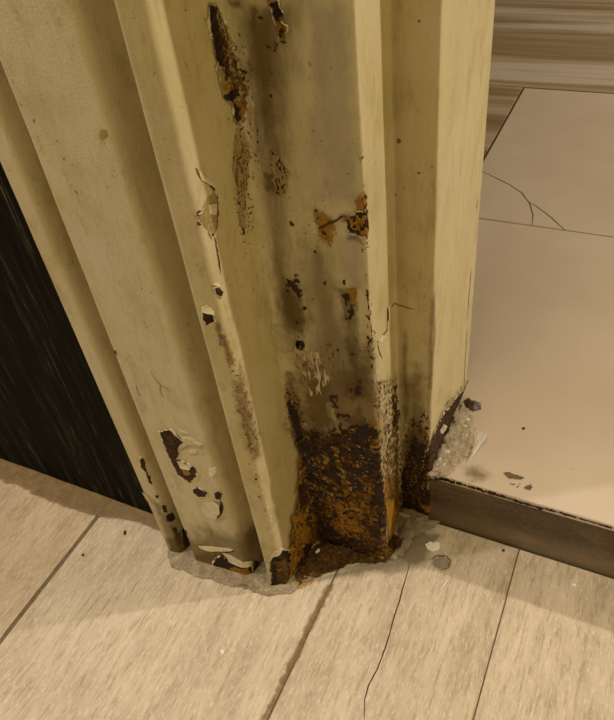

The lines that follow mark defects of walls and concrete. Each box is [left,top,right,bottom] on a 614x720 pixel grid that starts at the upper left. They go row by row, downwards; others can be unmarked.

corrosion [207,3,255,127]
corrosion [266,0,289,52]
spalling [196,168,221,271]
corrosion [314,193,369,253]
crack [482,171,565,230]
spalling [200,305,220,332]
corrosion [342,279,358,321]
peeling [158,429,224,520]
corrosion [254,367,464,588]
spalling [427,401,612,529]
peeling [194,546,253,575]
crack [364,563,410,716]